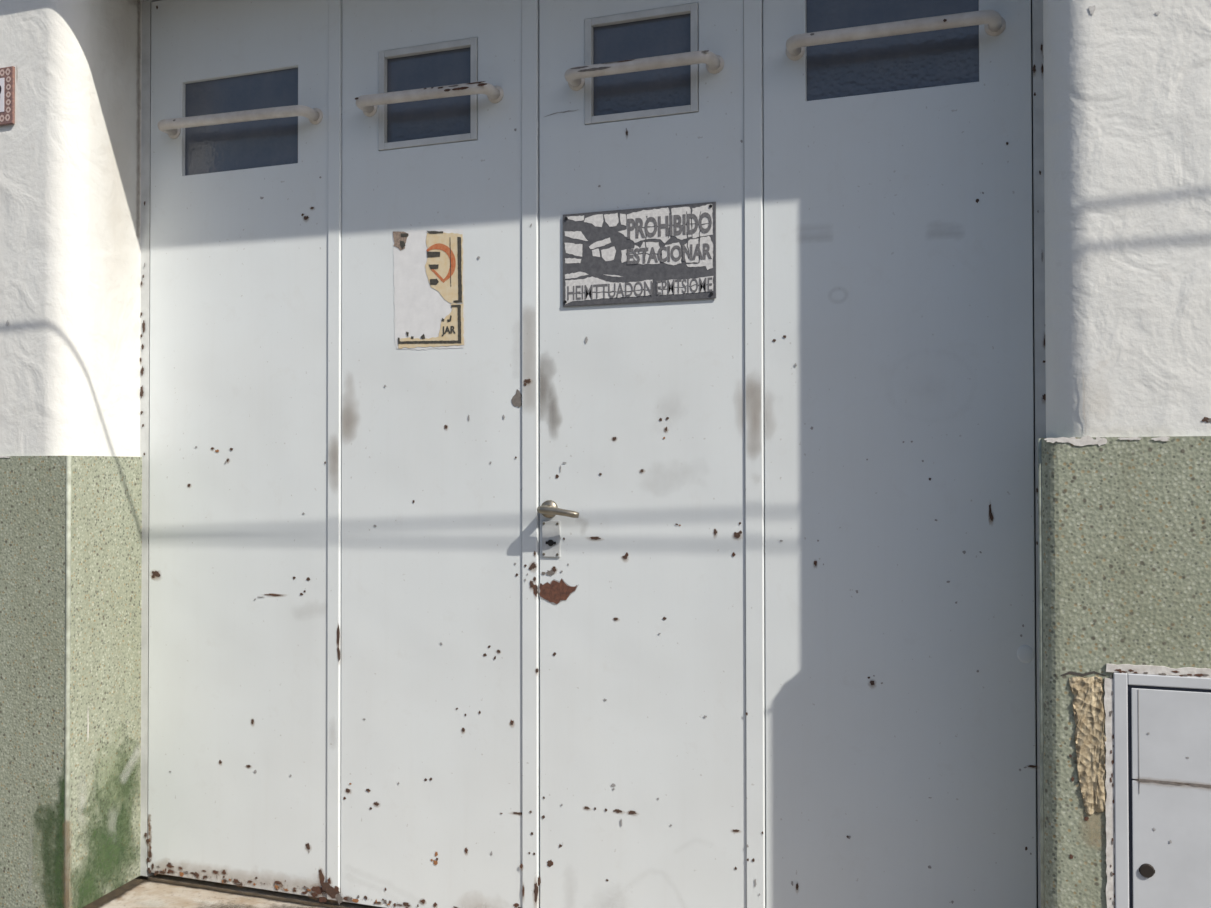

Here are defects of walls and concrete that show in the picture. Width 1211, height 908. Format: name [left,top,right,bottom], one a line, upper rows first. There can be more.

corrosion [533,578,578,605]
flaking render [1069,664,1211,908]
corrosion [144,816,437,908]